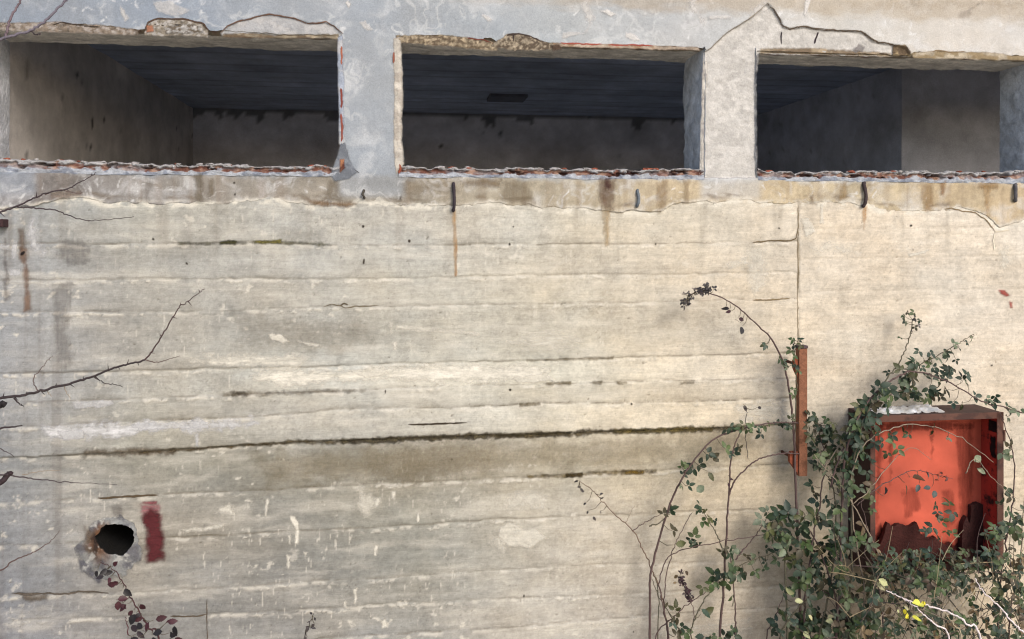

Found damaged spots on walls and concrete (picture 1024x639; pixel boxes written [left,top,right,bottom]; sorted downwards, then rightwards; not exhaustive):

flaking render [221,13,359,181]
flaking render [393,3,1024,178]
water stain [603,179,613,244]
crack [753,212,799,331]
crack [946,208,1009,251]